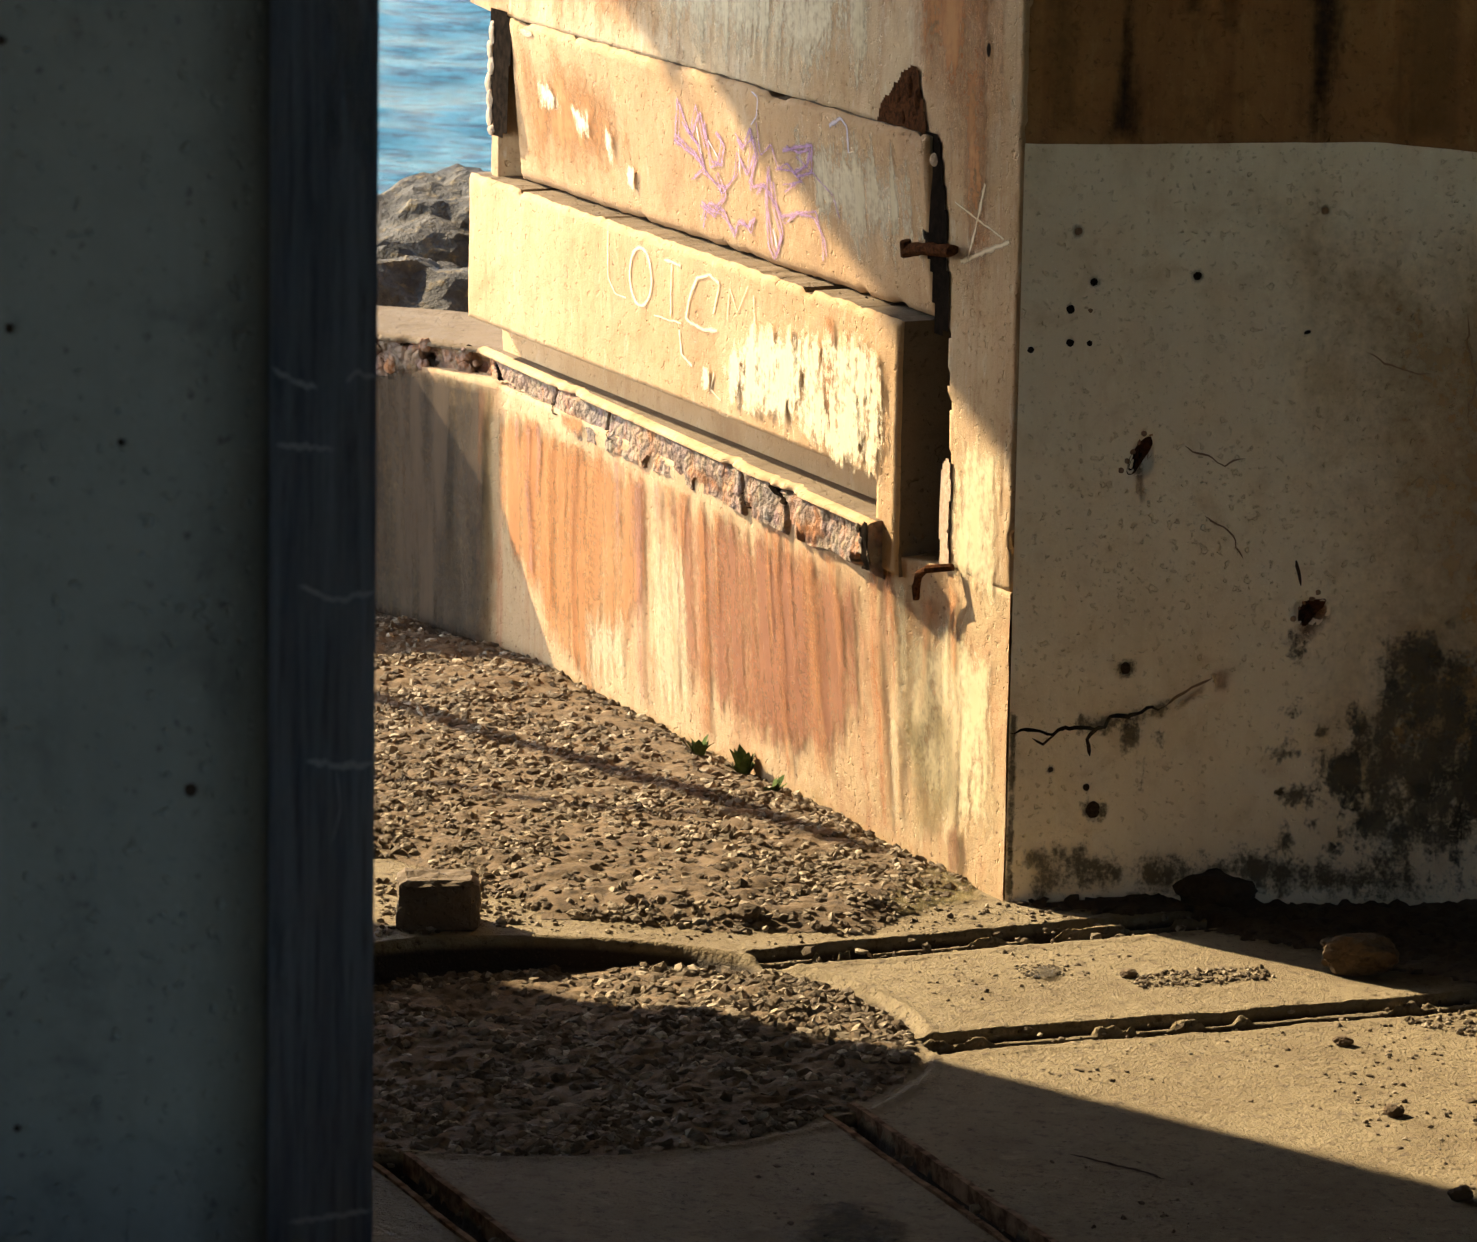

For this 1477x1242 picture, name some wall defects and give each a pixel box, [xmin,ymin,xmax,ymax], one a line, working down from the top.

spalling [877,65,926,135]
water stain [1114,6,1137,136]
water stain [1311,0,1341,133]
peeling [701,322,883,474]
hole [1119,431,1153,497]
corrosion [499,414,895,822]
water stain [891,289,1477,901]
hole [1290,560,1327,639]
crack [1016,678,1212,784]